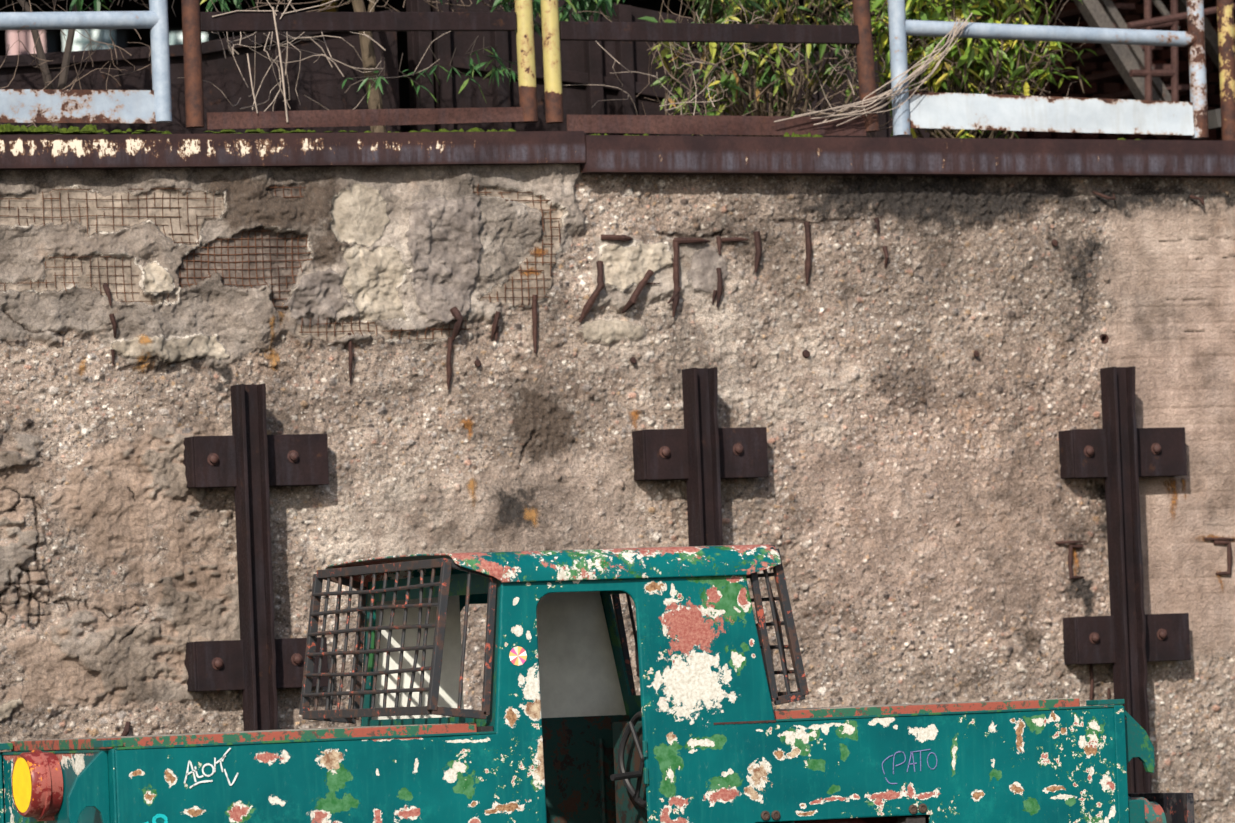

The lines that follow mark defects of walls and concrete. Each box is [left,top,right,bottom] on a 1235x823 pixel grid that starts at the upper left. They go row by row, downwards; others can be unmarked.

spalling [0,184,568,390]
corrosion [522,248,547,276]
crack [0,487,147,643]